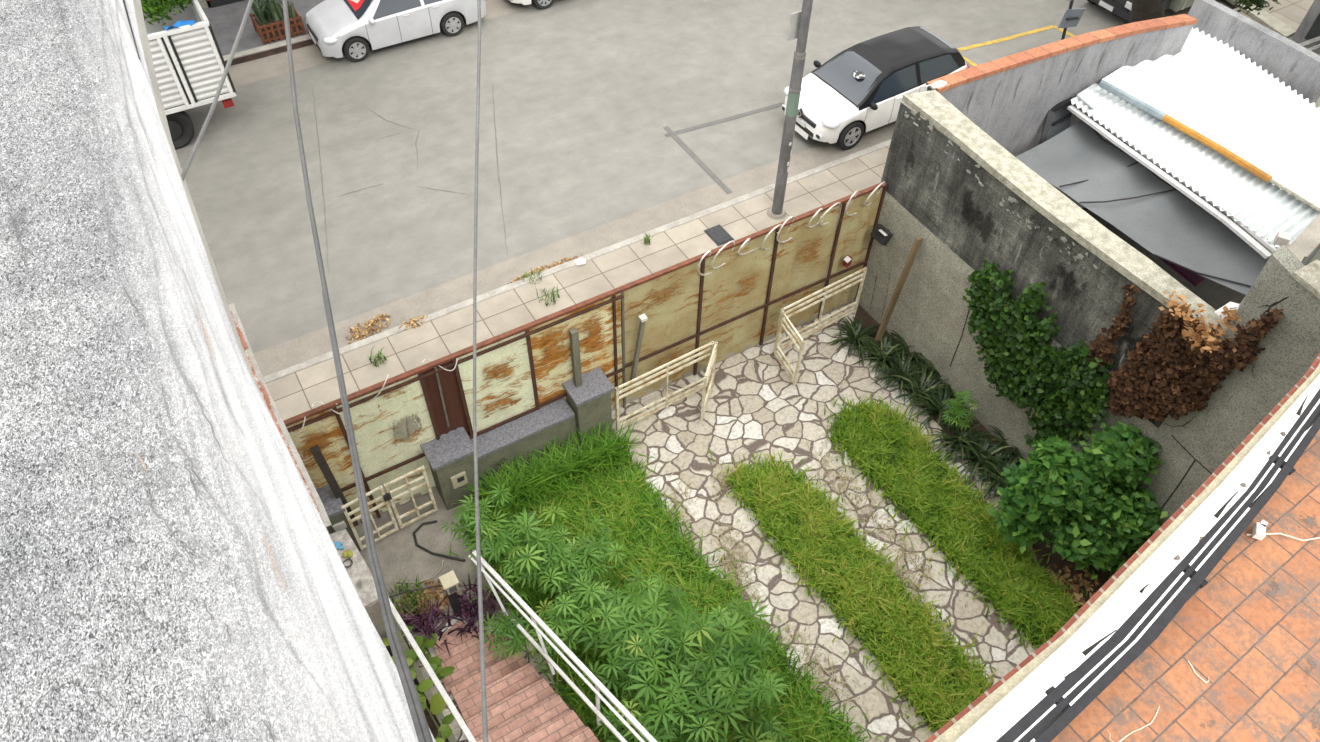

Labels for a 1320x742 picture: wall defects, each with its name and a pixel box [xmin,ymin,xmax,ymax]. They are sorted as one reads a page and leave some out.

crack [57,0,99,162]
crack [6,171,62,303]
crack [160,381,227,505]
rust [477,357,522,419]
rust [537,313,606,365]
crack [134,455,196,565]
crack [131,595,160,628]
crack [203,602,231,641]